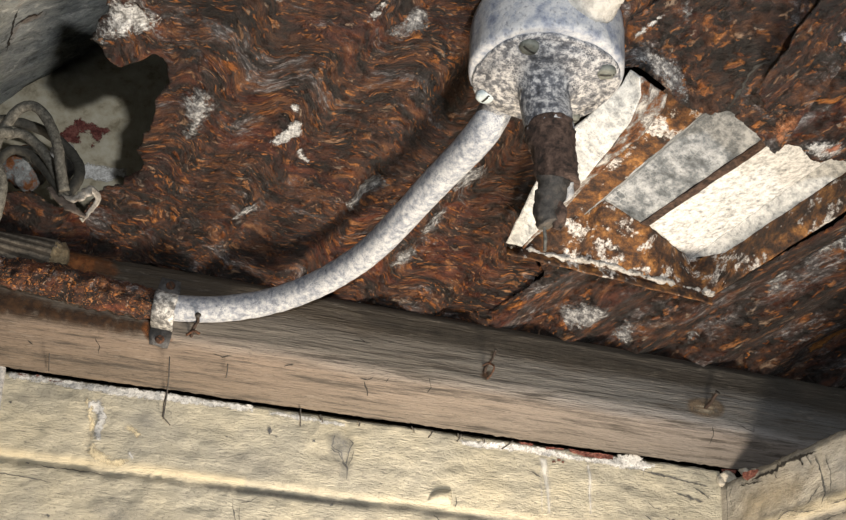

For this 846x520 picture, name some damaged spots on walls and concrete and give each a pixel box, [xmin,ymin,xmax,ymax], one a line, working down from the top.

peeling [631,48,687,99]
peeling [60,118,110,148]
peeling [772,116,800,142]
peeling [806,142,842,160]
peeling [46,162,126,222]
rust [67,253,96,272]
peeling [805,228,846,263]
peeling [768,270,787,291]
rust [0,291,149,338]
crack [641,451,846,520]